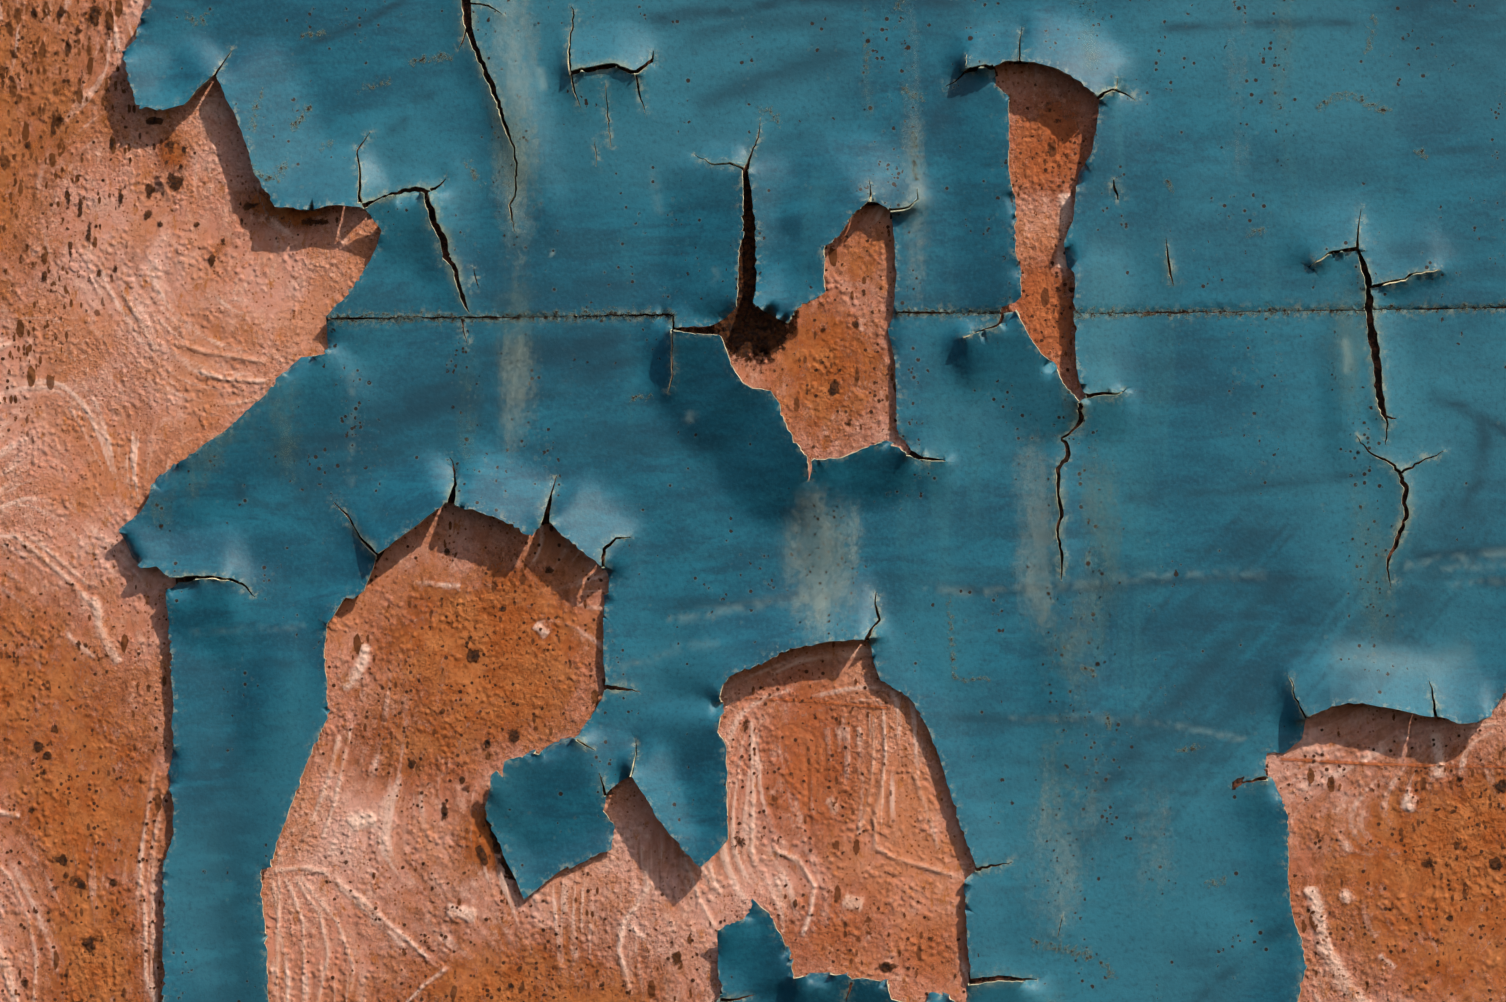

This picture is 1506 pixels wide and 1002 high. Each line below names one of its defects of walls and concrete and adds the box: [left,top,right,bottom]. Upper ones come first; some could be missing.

corrosion [0,0,196,437]
peeling [0,0,449,1002]
crack [356,137,479,342]
crack [459,0,518,231]
crack [561,7,654,165]
peeling [644,141,932,524]
crack [1281,199,1459,587]
corrosion [0,591,173,1002]
corrosion [319,521,718,1002]
peeling [232,452,1054,1002]
peeling [1236,614,1506,1002]
corrosion [1266,710,1506,1002]